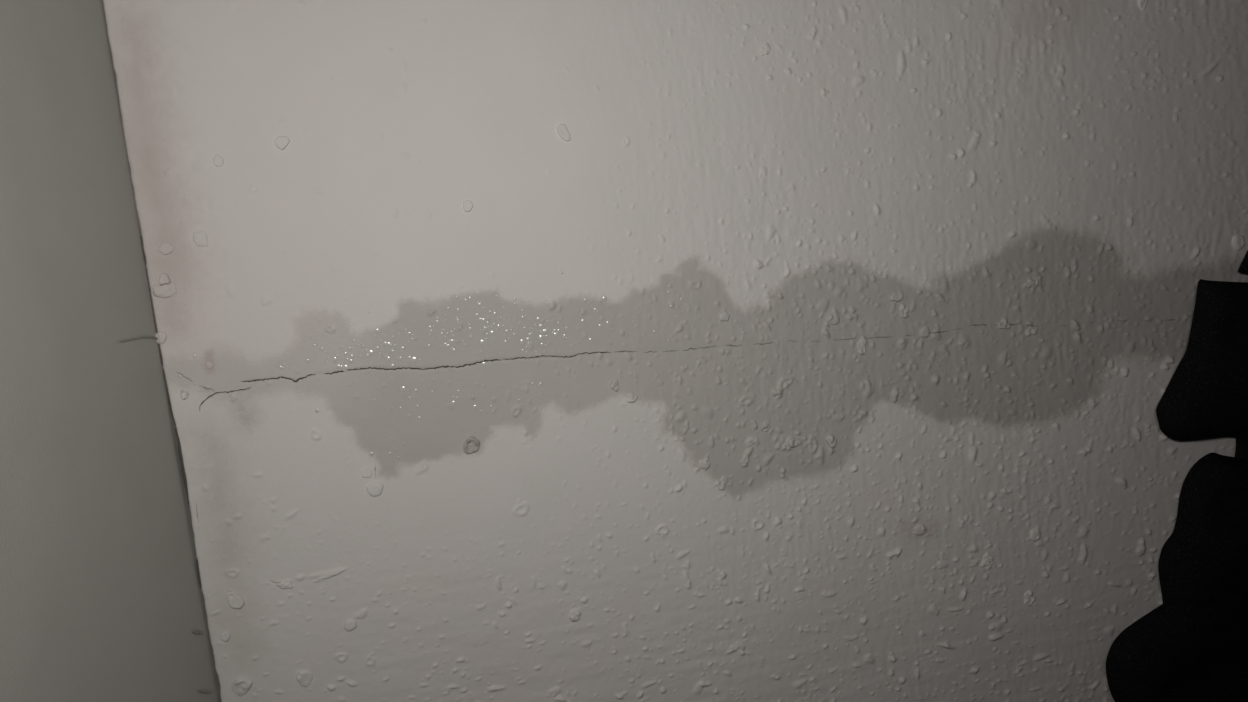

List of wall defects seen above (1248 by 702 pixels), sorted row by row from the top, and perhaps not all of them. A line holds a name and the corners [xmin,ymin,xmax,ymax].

crack [121,236,1128,518]
water stain [273,227,1248,496]
crack [195,559,203,588]